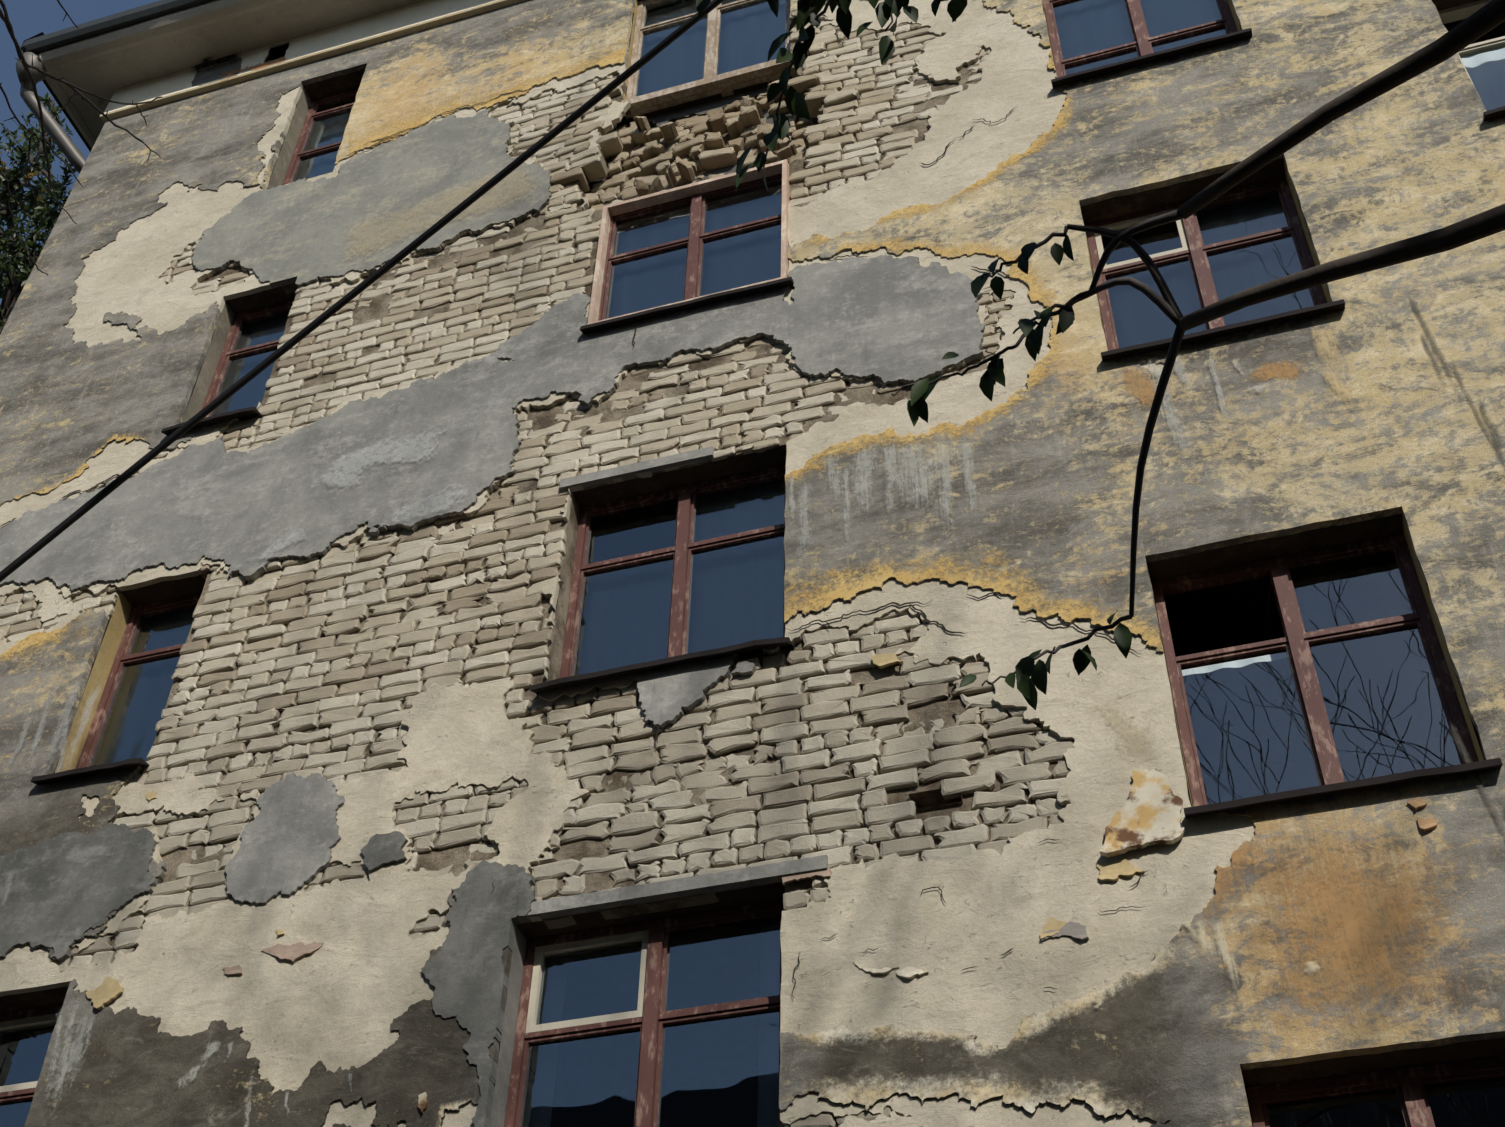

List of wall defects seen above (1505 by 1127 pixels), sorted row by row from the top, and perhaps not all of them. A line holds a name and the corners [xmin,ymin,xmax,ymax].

spalling [788,0,1072,247]
spalling [0,39,631,529]
leakage [789,479,808,544]
leakage [828,444,976,530]
spalling [0,238,1257,1093]
leakage [1185,921,1236,979]
spalling [323,1099,407,1127]
spalling [418,1092,478,1127]
spalling [780,1077,1169,1127]